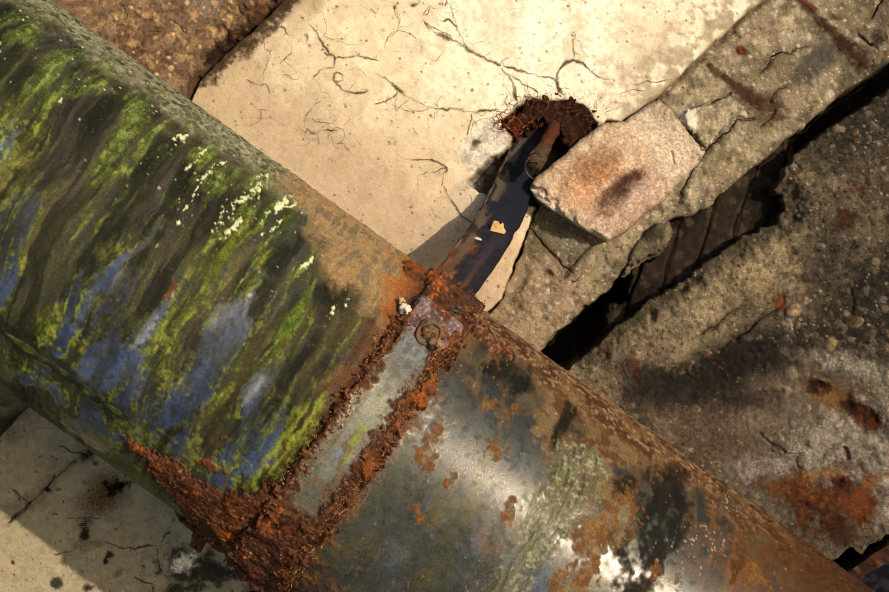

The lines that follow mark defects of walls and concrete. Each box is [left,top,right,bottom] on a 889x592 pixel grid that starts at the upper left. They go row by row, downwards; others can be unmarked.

crack [246,1,665,135]
peeling [680,96,734,149]
rust [700,58,787,126]
rust [786,0,875,73]
crack [399,155,472,223]
rust [596,170,642,216]
crack [534,232,594,283]
peeling [621,220,674,277]
rust [803,379,888,433]
crack [9,427,89,523]
rust [120,301,458,590]
rust [754,462,889,546]